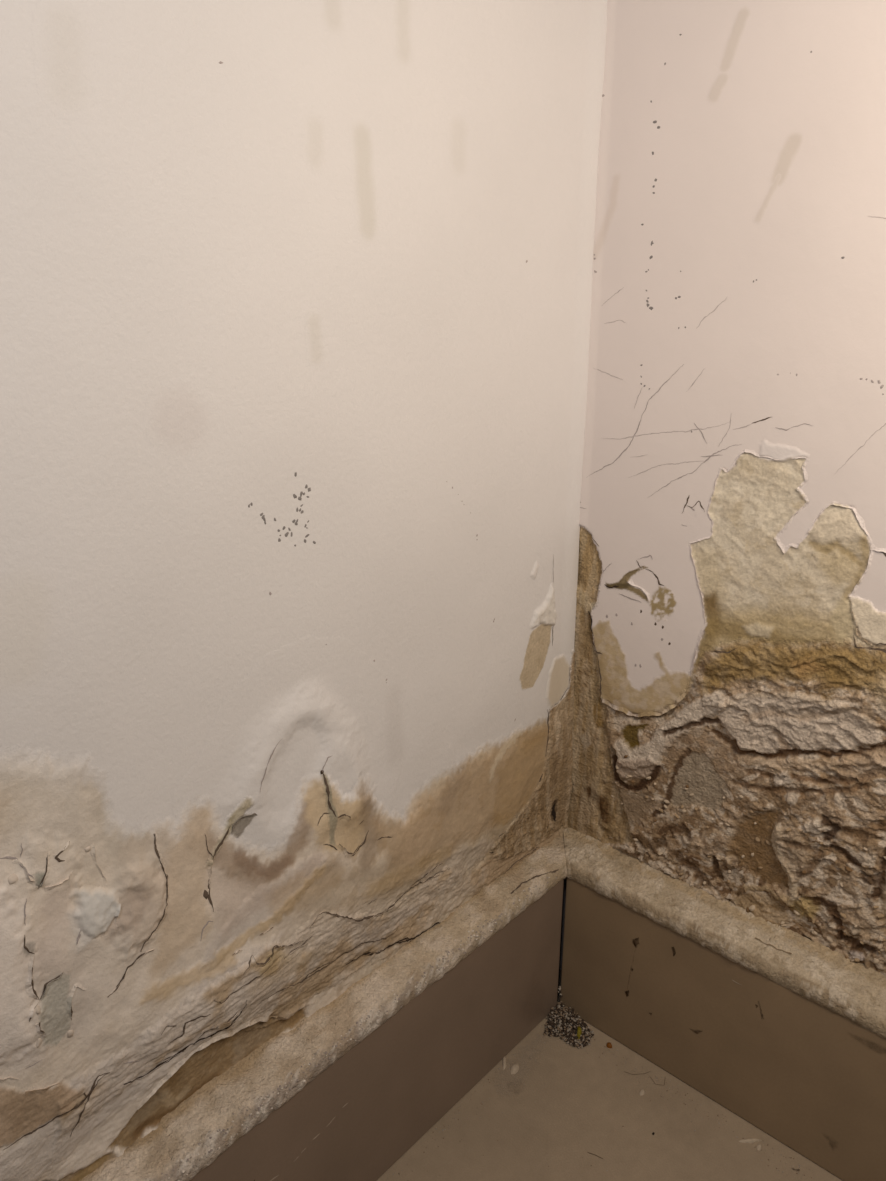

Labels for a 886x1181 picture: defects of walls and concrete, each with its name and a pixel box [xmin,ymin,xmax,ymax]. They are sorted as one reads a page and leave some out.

damp [248,472,316,547]
crack [580,364,812,526]
crack [260,739,282,790]
crack [318,756,391,858]
spalling [0,438,886,1181]
crack [108,833,169,997]
damp [0,712,549,1090]
crack [5,863,450,1149]
damp [0,1030,225,1181]